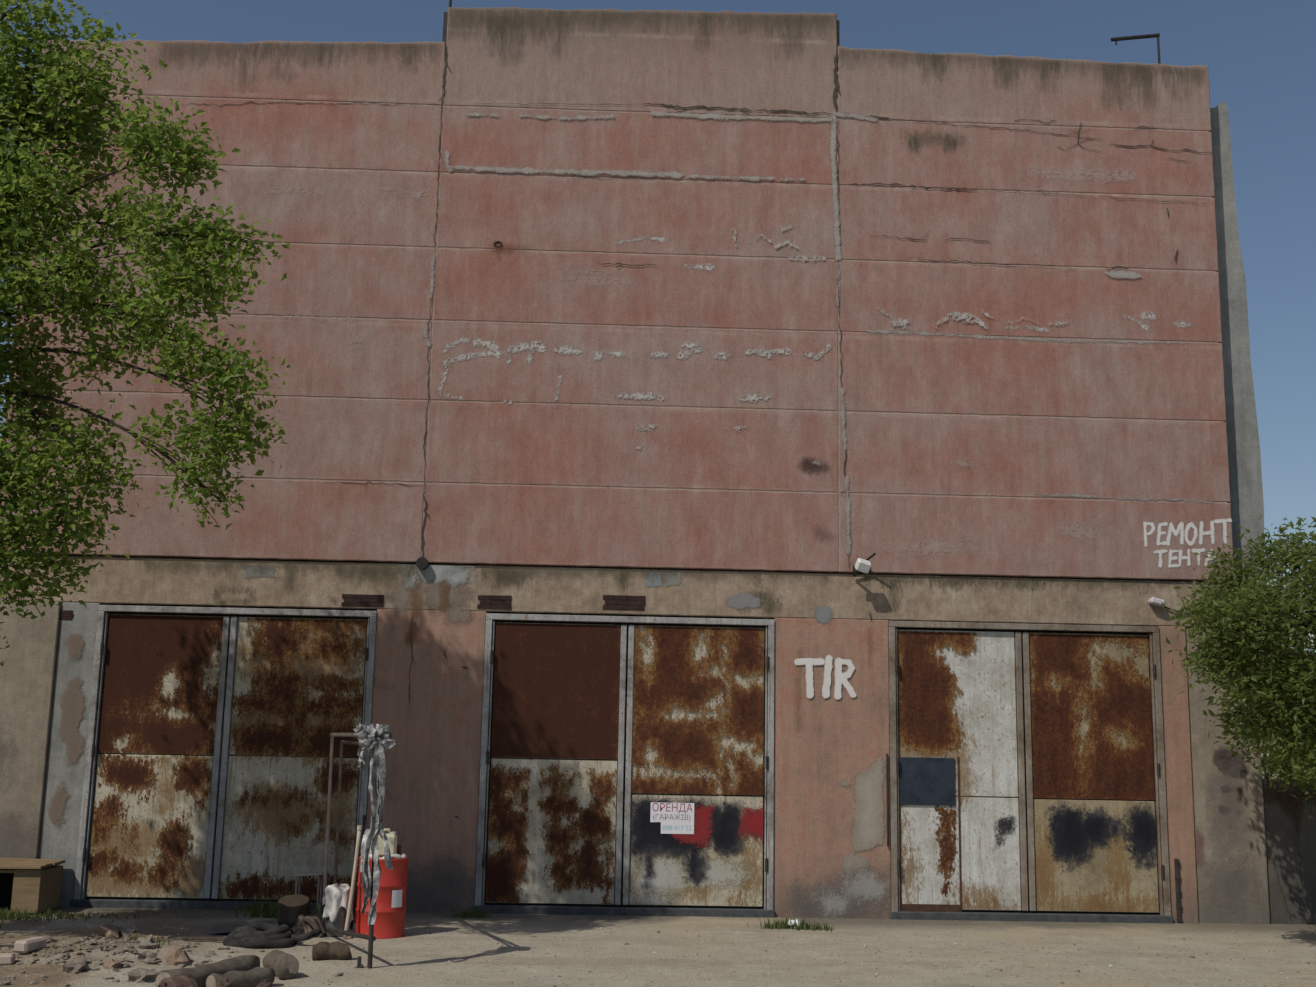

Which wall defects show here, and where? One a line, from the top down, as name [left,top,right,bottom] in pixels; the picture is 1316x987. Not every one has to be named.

peeling [444,150,805,182]
peeling [422,326,626,400]
peeling [648,342,832,360]
crack [475,51,1211,496]
peeling [867,307,1195,345]
spalling [1105,270,1143,280]
rust [86,615,367,900]
rust [485,623,764,906]
peeling [841,757,886,876]
rust [898,631,1158,912]